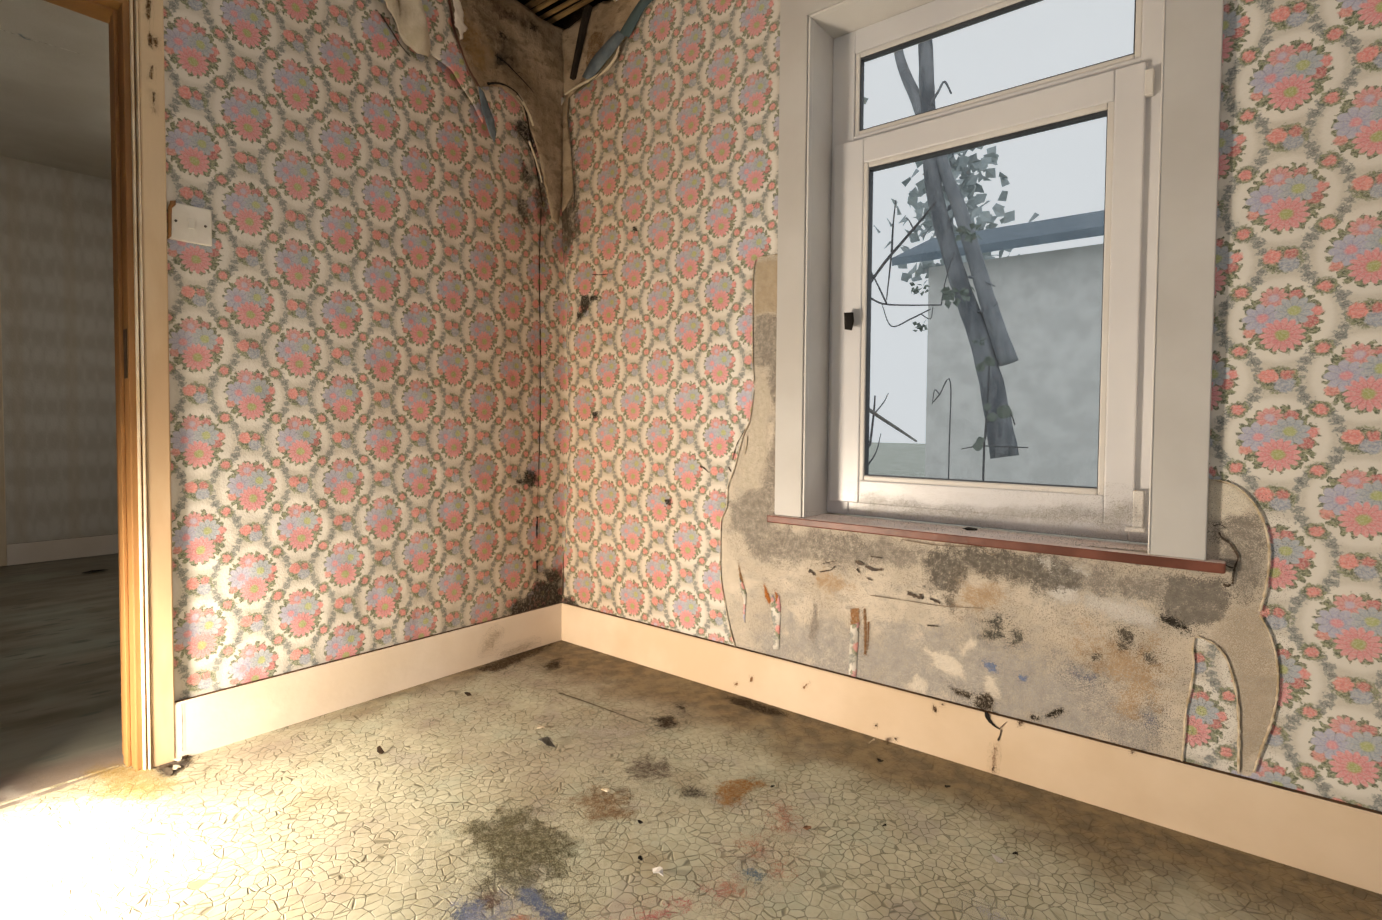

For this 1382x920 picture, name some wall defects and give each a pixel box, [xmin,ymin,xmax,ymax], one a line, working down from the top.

flaking render [448,0,640,225]
damp [513,110,583,264]
mould [505,567,579,616]
flaking render [720,254,1280,776]
damp [724,258,1284,771]
crack [1213,524,1239,587]